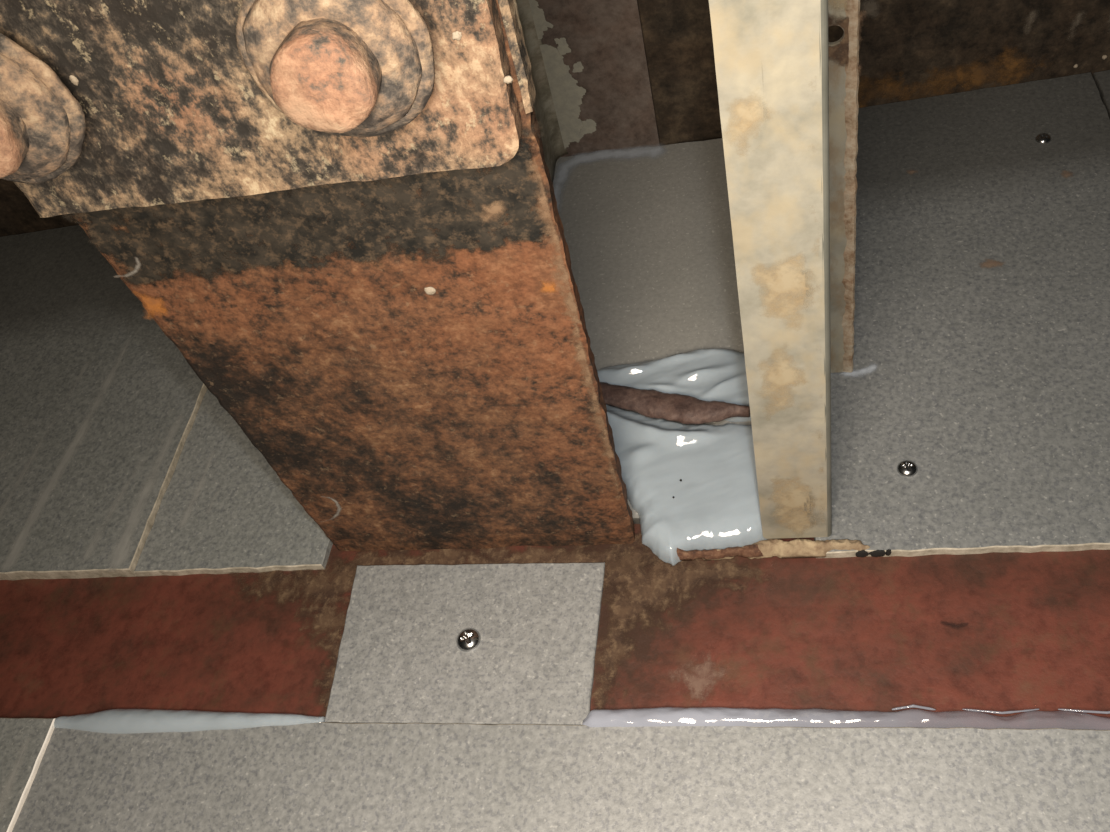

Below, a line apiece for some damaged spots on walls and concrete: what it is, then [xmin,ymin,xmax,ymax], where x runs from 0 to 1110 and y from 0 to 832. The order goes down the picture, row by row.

rust [498,0,536,114]
peeling [529,0,597,148]
rust [483,202,503,221]
rust [828,0,1027,372]
rust [140,295,167,317]
rust [531,165,750,486]